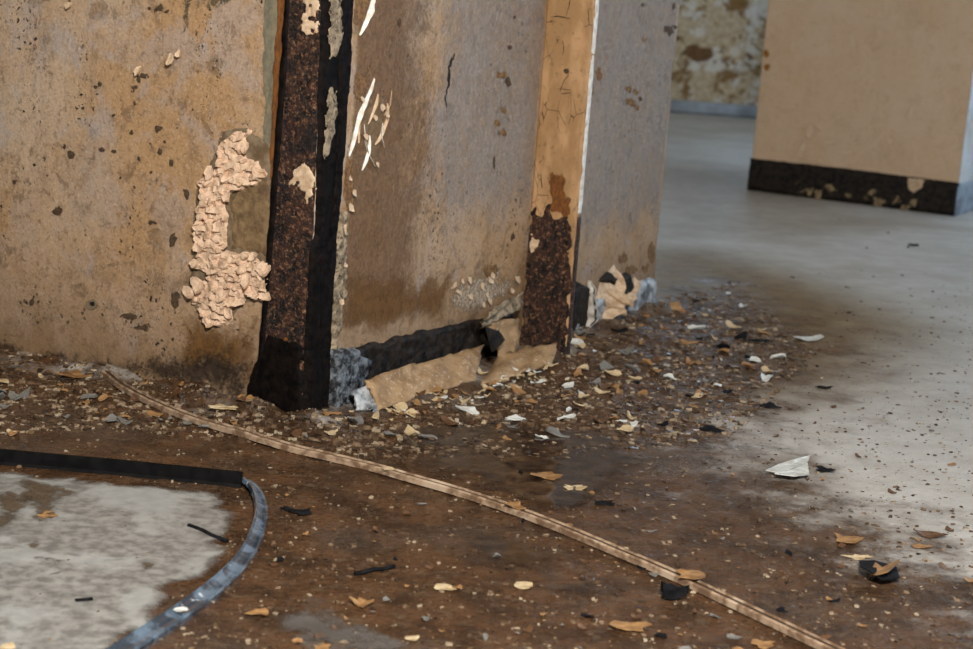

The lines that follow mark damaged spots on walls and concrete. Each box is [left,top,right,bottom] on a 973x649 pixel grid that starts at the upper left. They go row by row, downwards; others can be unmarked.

corrosion [269,0,285,180]
crack [444,53,455,107]
peeling [171,128,271,328]
corrosion [520,173,581,354]
spalling [320,67,786,442]
corrosion [247,335,308,412]